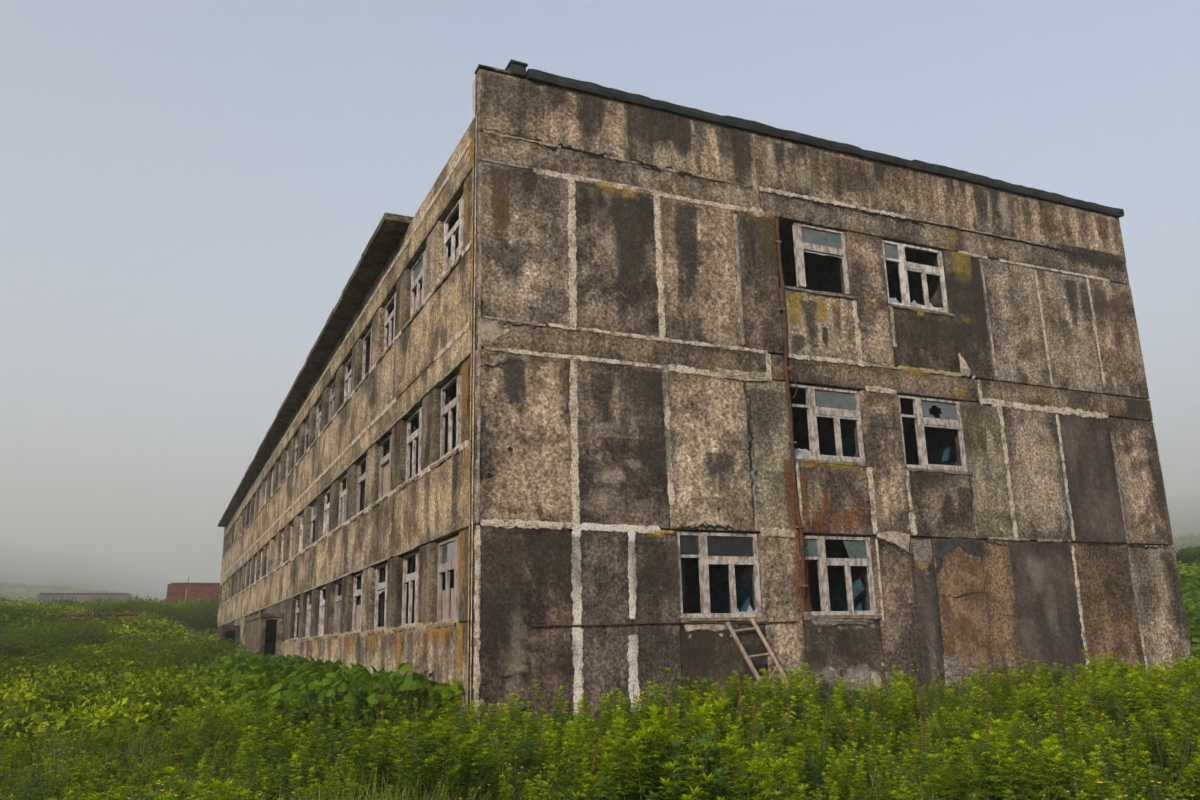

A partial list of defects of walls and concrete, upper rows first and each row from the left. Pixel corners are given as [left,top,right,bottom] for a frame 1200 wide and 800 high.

leakage [577,93,604,136]
leakage [626,104,691,153]
leakage [715,127,753,185]
leakage [774,143,805,170]
leakage [491,167,537,247]
leakage [600,189,650,311]
leakage [946,178,1008,224]
leakage [1022,200,1125,271]
corrosion [783,459,864,609]
leakage [479,535,583,650]
peeling [877,525,991,690]